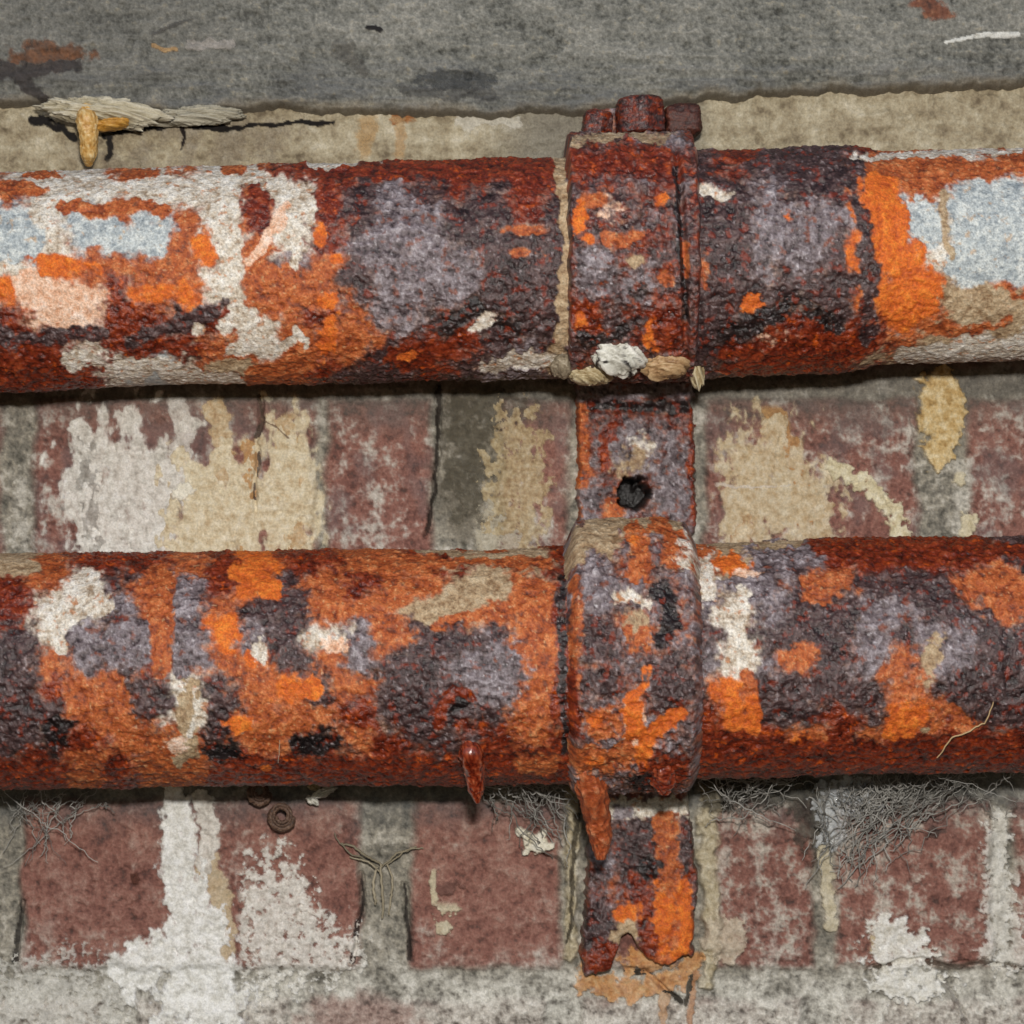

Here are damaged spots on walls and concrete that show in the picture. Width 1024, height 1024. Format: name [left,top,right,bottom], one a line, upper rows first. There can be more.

crack [425,383,442,536]
peeling [958,511,980,537]